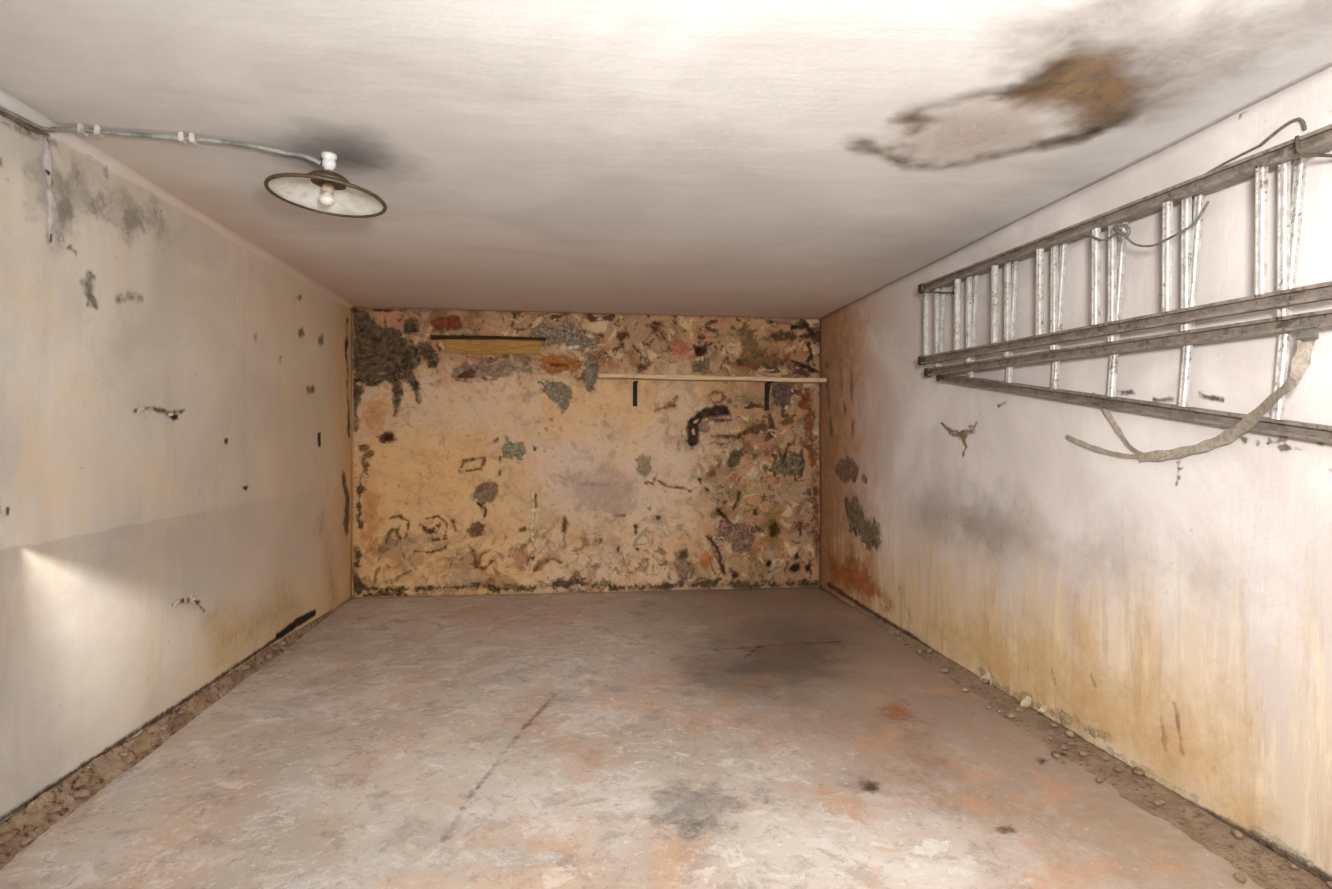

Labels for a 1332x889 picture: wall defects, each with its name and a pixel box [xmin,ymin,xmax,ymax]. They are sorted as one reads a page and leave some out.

water stain [1004,53,1137,147]
water stain [41,136,56,242]
water stain [345,308,441,437]
flaking render [452,319,599,414]
spalling [670,328,711,374]
water stain [342,472,350,535]
flaking render [356,442,374,529]
flaking render [419,437,536,541]
flaking render [636,454,692,492]
flaking render [706,491,757,578]
flaking render [727,444,805,479]
flaking render [941,422,977,456]